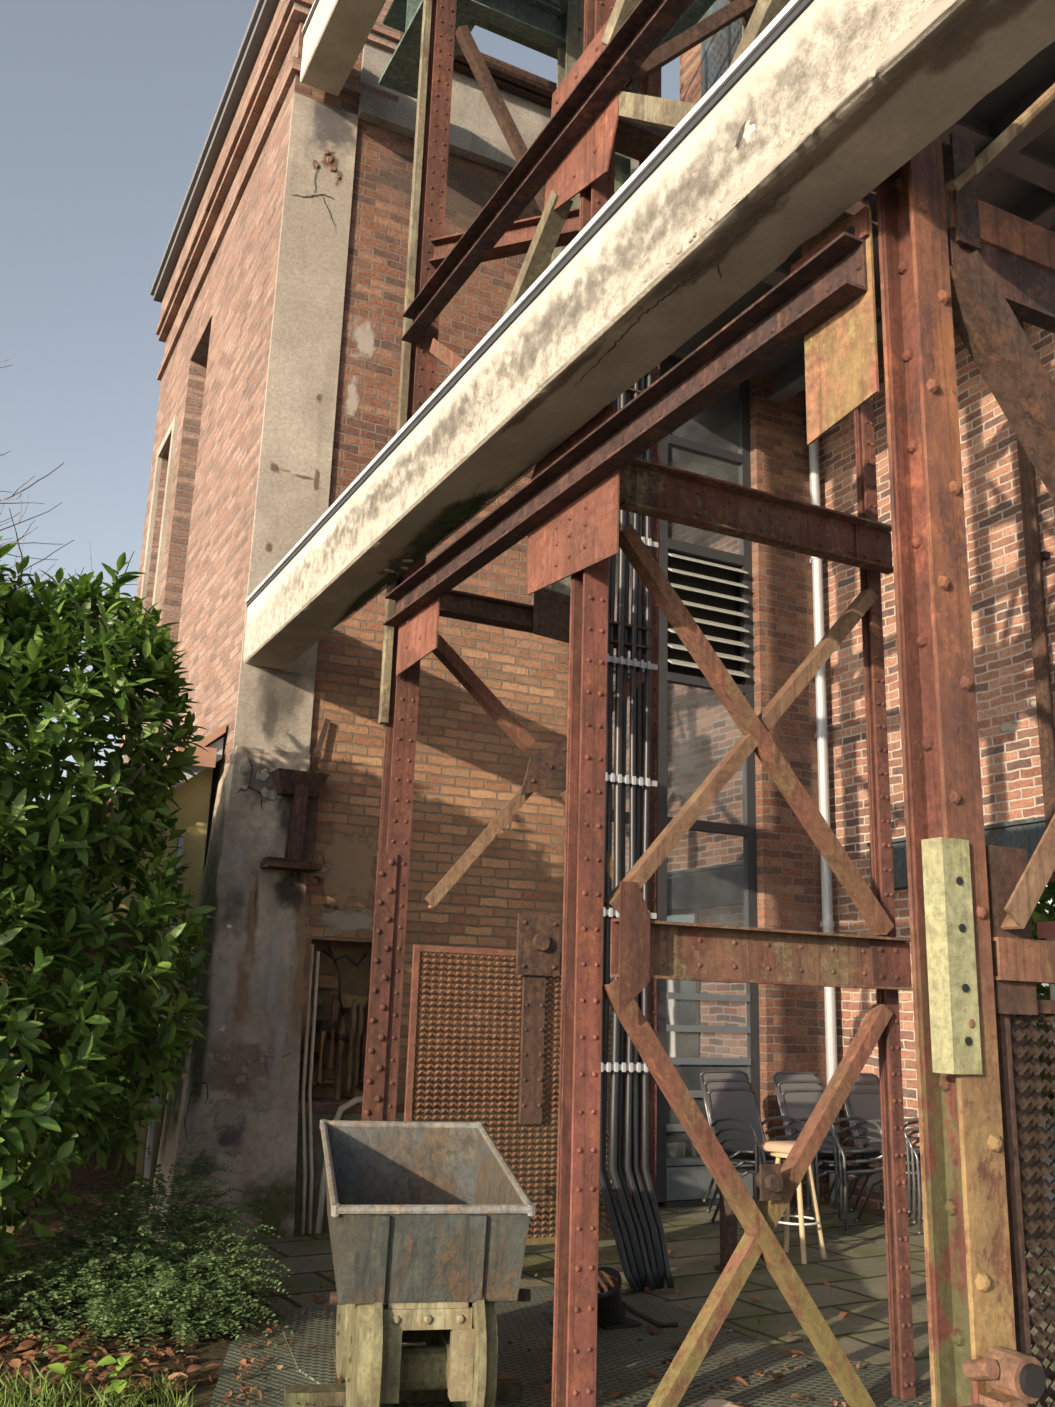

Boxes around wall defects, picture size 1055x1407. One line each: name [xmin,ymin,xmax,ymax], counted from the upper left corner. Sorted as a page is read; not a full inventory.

damp [314,100,354,144]
damp [648,0,1033,300]
crack [291,171,337,230]
damp [503,349,598,432]
damp [263,673,296,733]
crack [238,758,274,810]